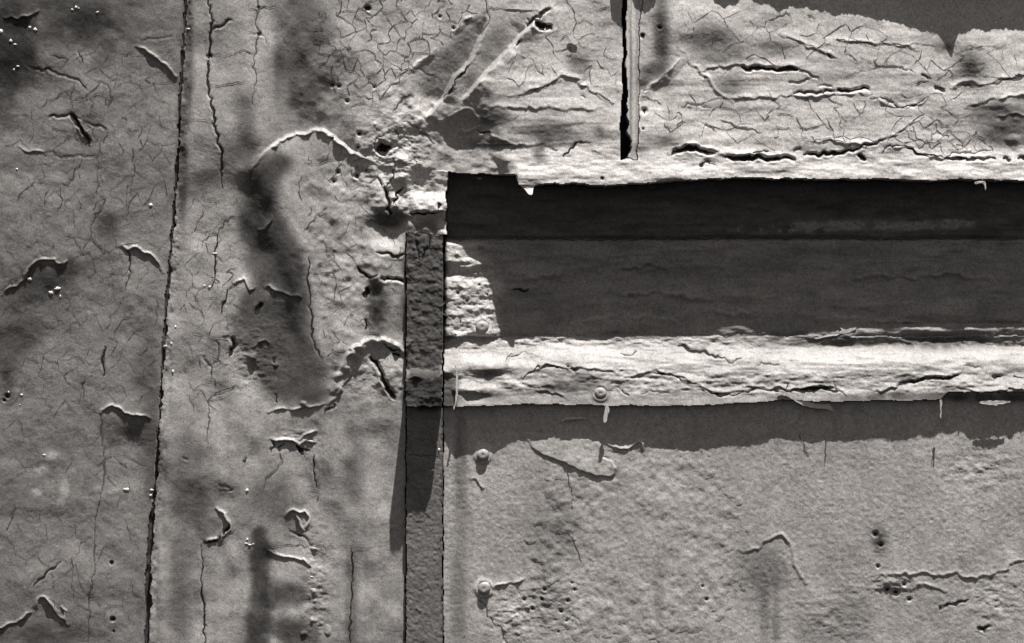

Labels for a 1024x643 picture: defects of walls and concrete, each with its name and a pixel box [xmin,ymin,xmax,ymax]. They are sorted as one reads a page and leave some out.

crack [188,0,289,186]
crack [641,10,1024,162]
peeling [516,175,536,195]
crack [298,60,1024,399]
peeling [0,248,69,297]
leakage [239,156,325,398]
peeling [814,327,856,339]
peeling [93,395,152,420]
peeling [266,396,326,459]
peeling [522,431,643,468]
peeling [501,346,840,411]
peeling [867,361,1024,405]